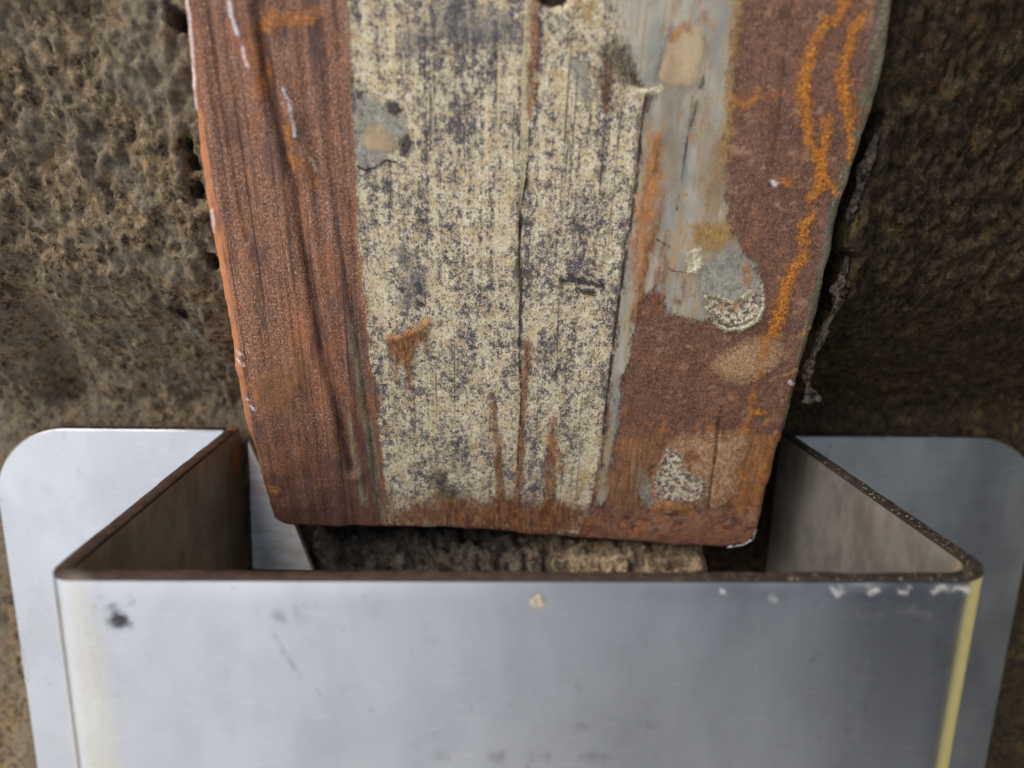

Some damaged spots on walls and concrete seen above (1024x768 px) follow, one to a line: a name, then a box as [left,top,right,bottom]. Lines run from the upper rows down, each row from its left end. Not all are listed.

peeling [352,94,413,171]
rust [387,318,431,397]
crack [512,101,538,471]
crack [554,270,562,378]
peeling [686,248,765,333]
rust [703,0,868,505]
rust [388,341,592,536]
peeling [655,448,705,512]